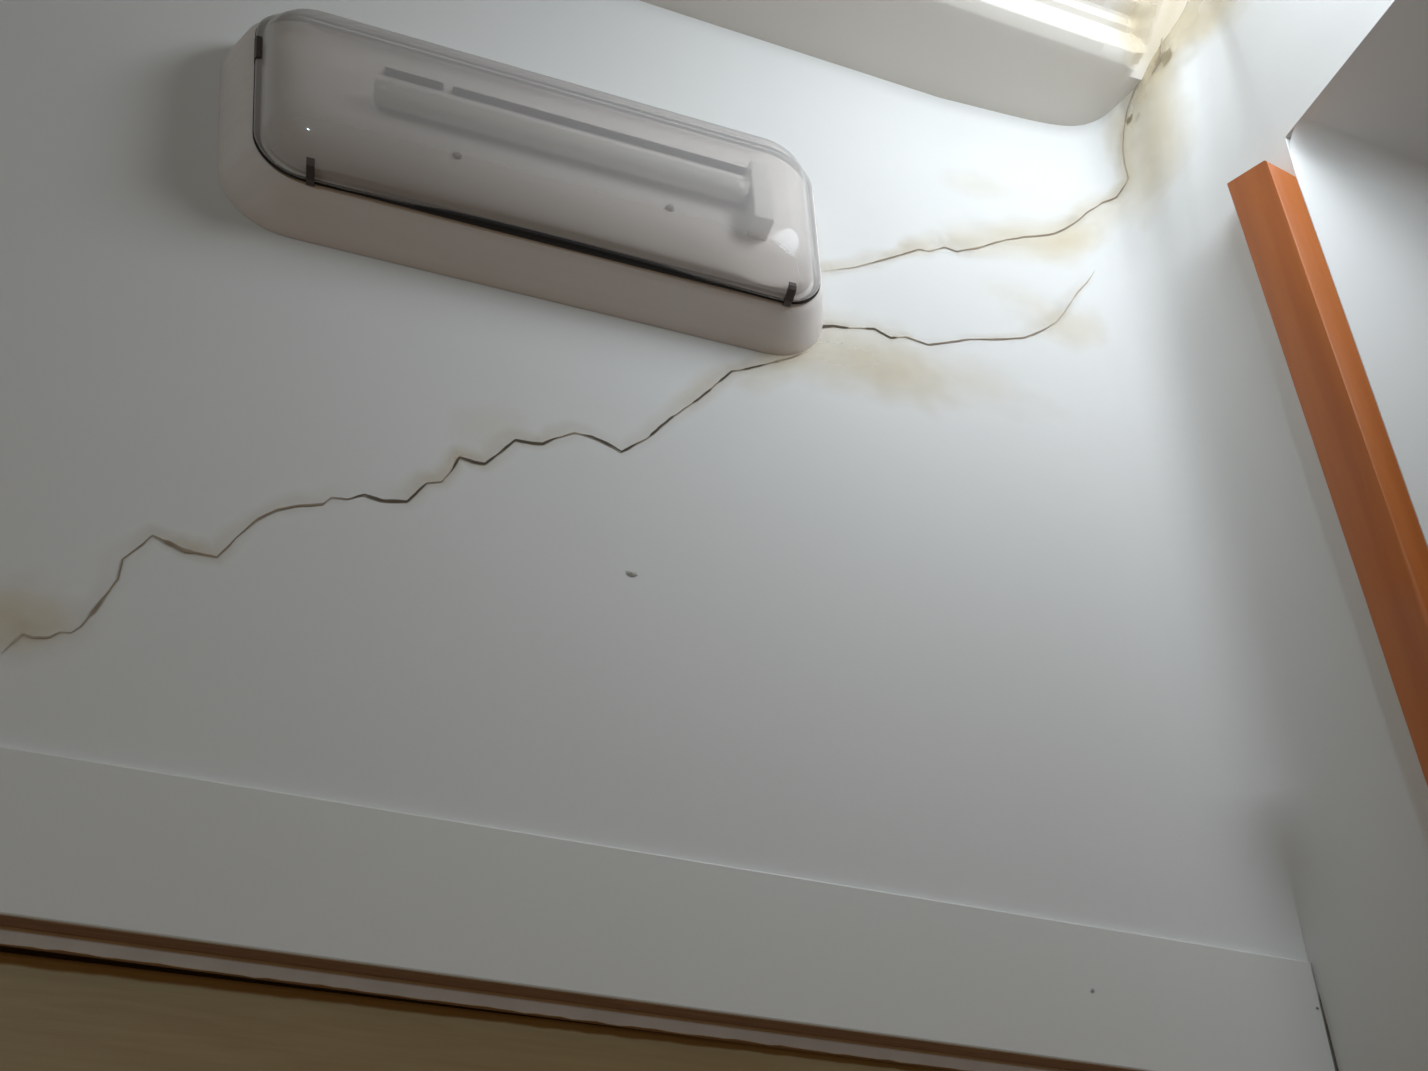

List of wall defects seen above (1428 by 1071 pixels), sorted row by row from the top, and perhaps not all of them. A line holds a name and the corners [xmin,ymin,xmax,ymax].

crack [828,38,1163,271]
crack [1,270,1095,654]